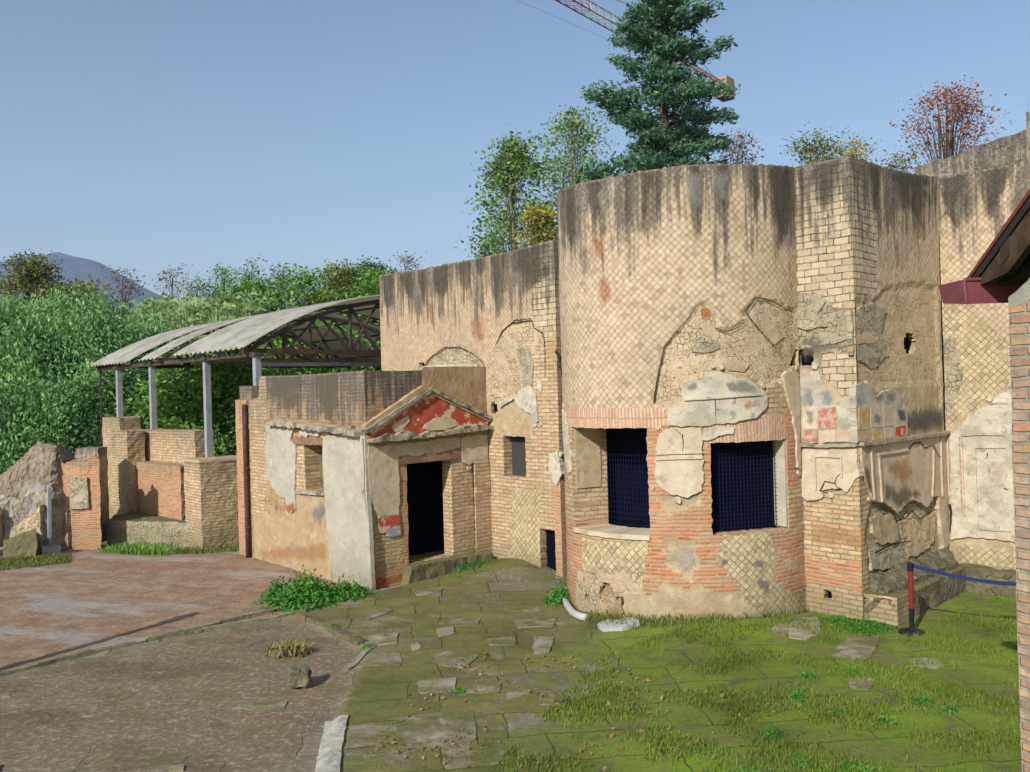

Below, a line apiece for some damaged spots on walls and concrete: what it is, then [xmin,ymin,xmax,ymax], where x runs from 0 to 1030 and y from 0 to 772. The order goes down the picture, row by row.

peeling [264,425,323,513]
peeling [545,403,575,485]
spalling [651,293,1015,571]
spalling [601,583,624,618]